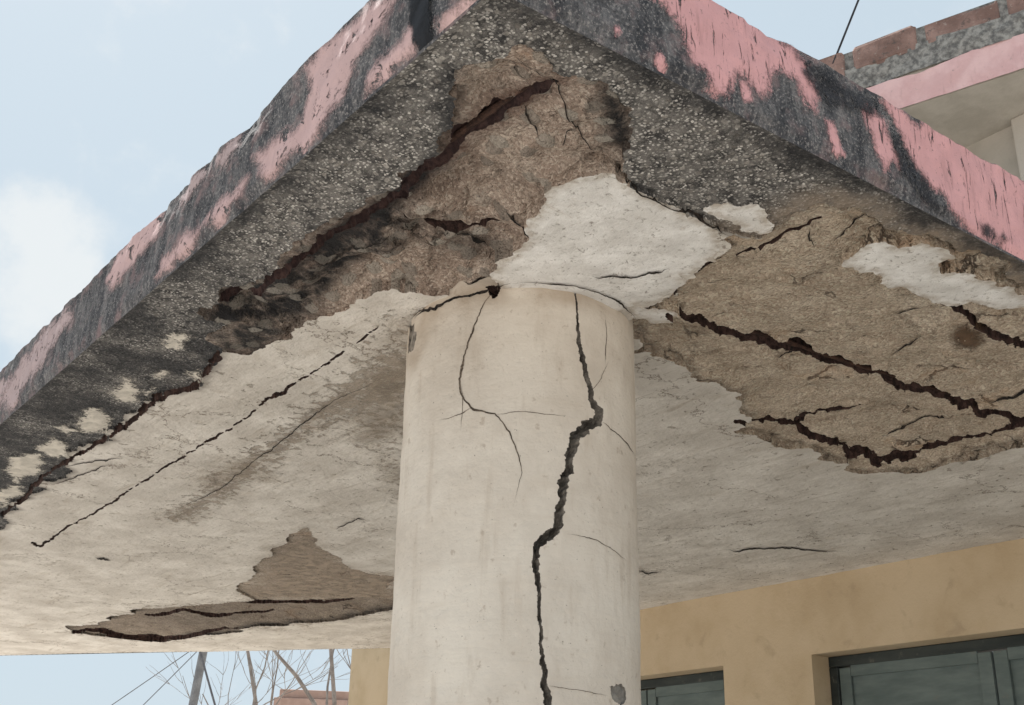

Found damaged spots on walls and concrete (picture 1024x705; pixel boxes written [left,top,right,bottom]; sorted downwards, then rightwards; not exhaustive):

peeling [156,0,395,279]
peeling [365,27,416,91]
spalling [196,44,633,355]
spalling [631,100,1024,474]
crack [1,327,400,547]
spalling [65,528,394,642]
crack [410,269,666,705]
crack [729,545,830,553]